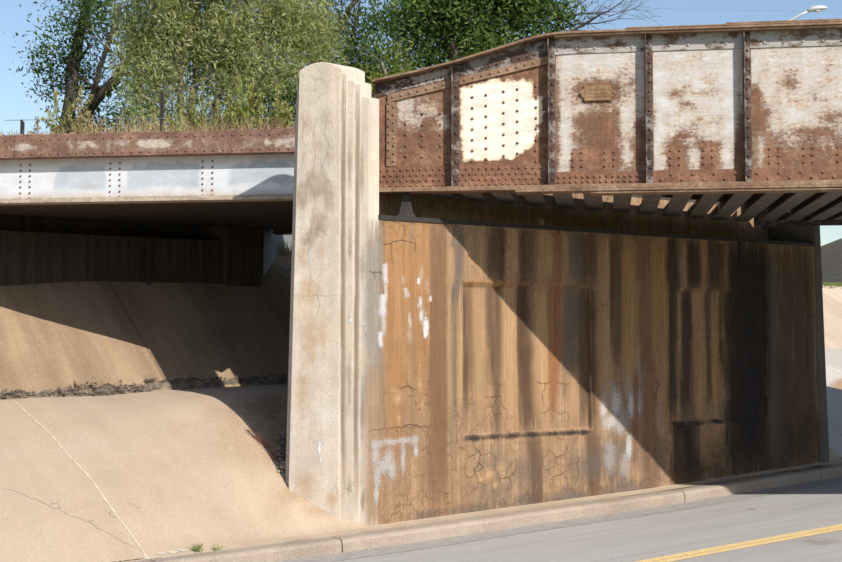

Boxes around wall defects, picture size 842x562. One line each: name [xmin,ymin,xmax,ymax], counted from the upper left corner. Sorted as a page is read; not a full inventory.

damp [449,225,465,386]
damp [477,227,643,431]
damp [653,238,720,407]
crack [474,385,517,489]
damp [467,430,633,506]
damp [672,421,732,490]